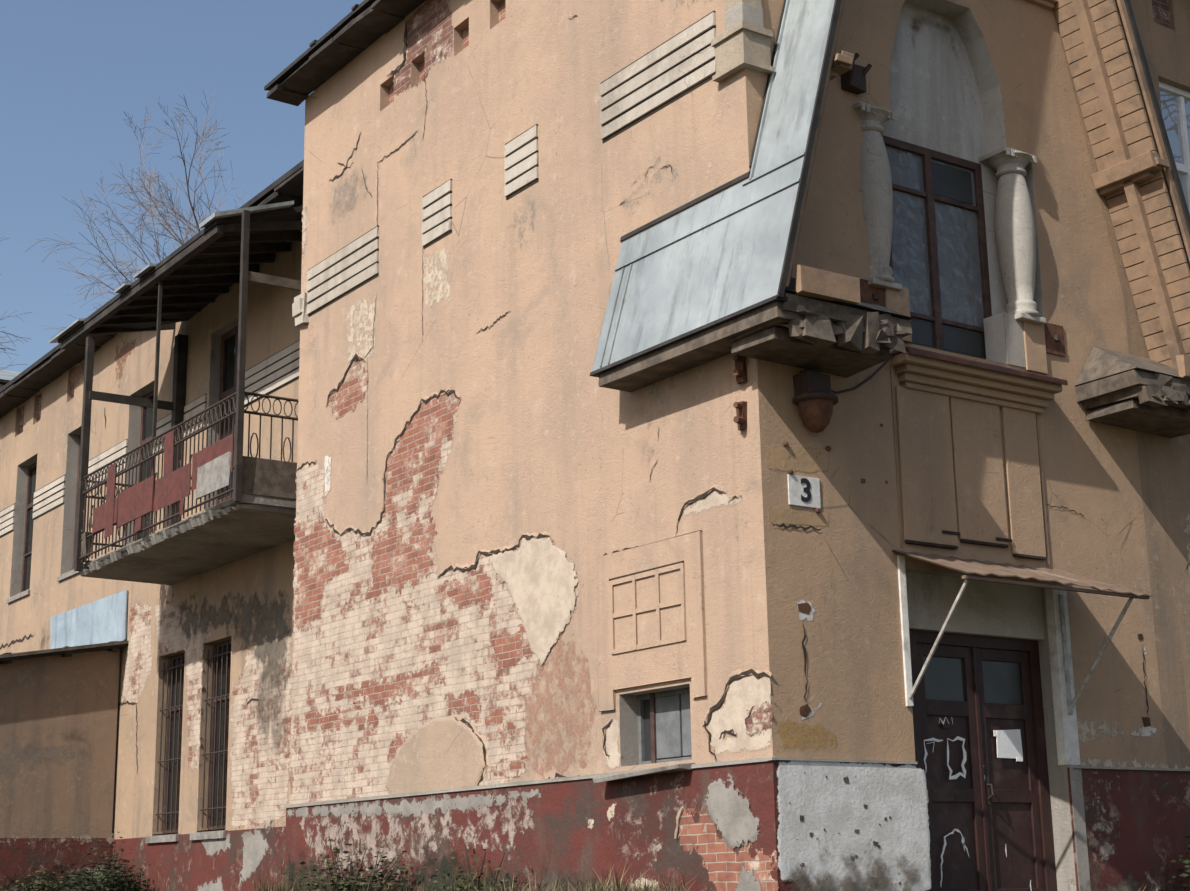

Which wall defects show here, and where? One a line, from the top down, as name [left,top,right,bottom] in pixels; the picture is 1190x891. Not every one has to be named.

flaking render [386,0,453,96]
crack [329,72,427,216]
flaking render [326,294,377,420]
flaking render [676,485,742,520]
flaking render [118,600,213,770]
damp [179,591,291,736]
flaking render [202,385,621,887]
flaking render [702,669,773,762]
crack [801,625,809,703]
peeling [198,877,223,891]
flaking render [674,806,804,891]
peeling [1074,757,1190,861]